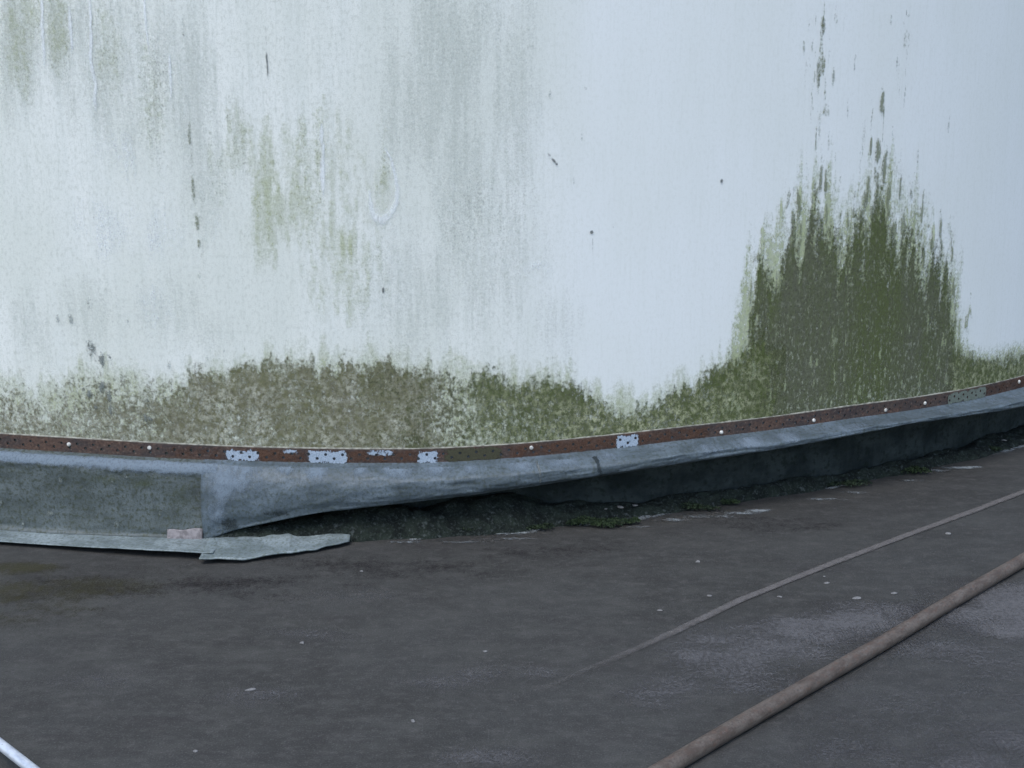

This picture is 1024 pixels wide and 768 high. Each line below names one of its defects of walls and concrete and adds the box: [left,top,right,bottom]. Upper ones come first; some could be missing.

water stain [779,138,953,275]
water stain [925,278,971,385]
rust [256,448,307,463]
rust [347,451,427,462]
rust [509,437,622,458]
rust [636,427,709,445]
water stain [736,438,762,448]